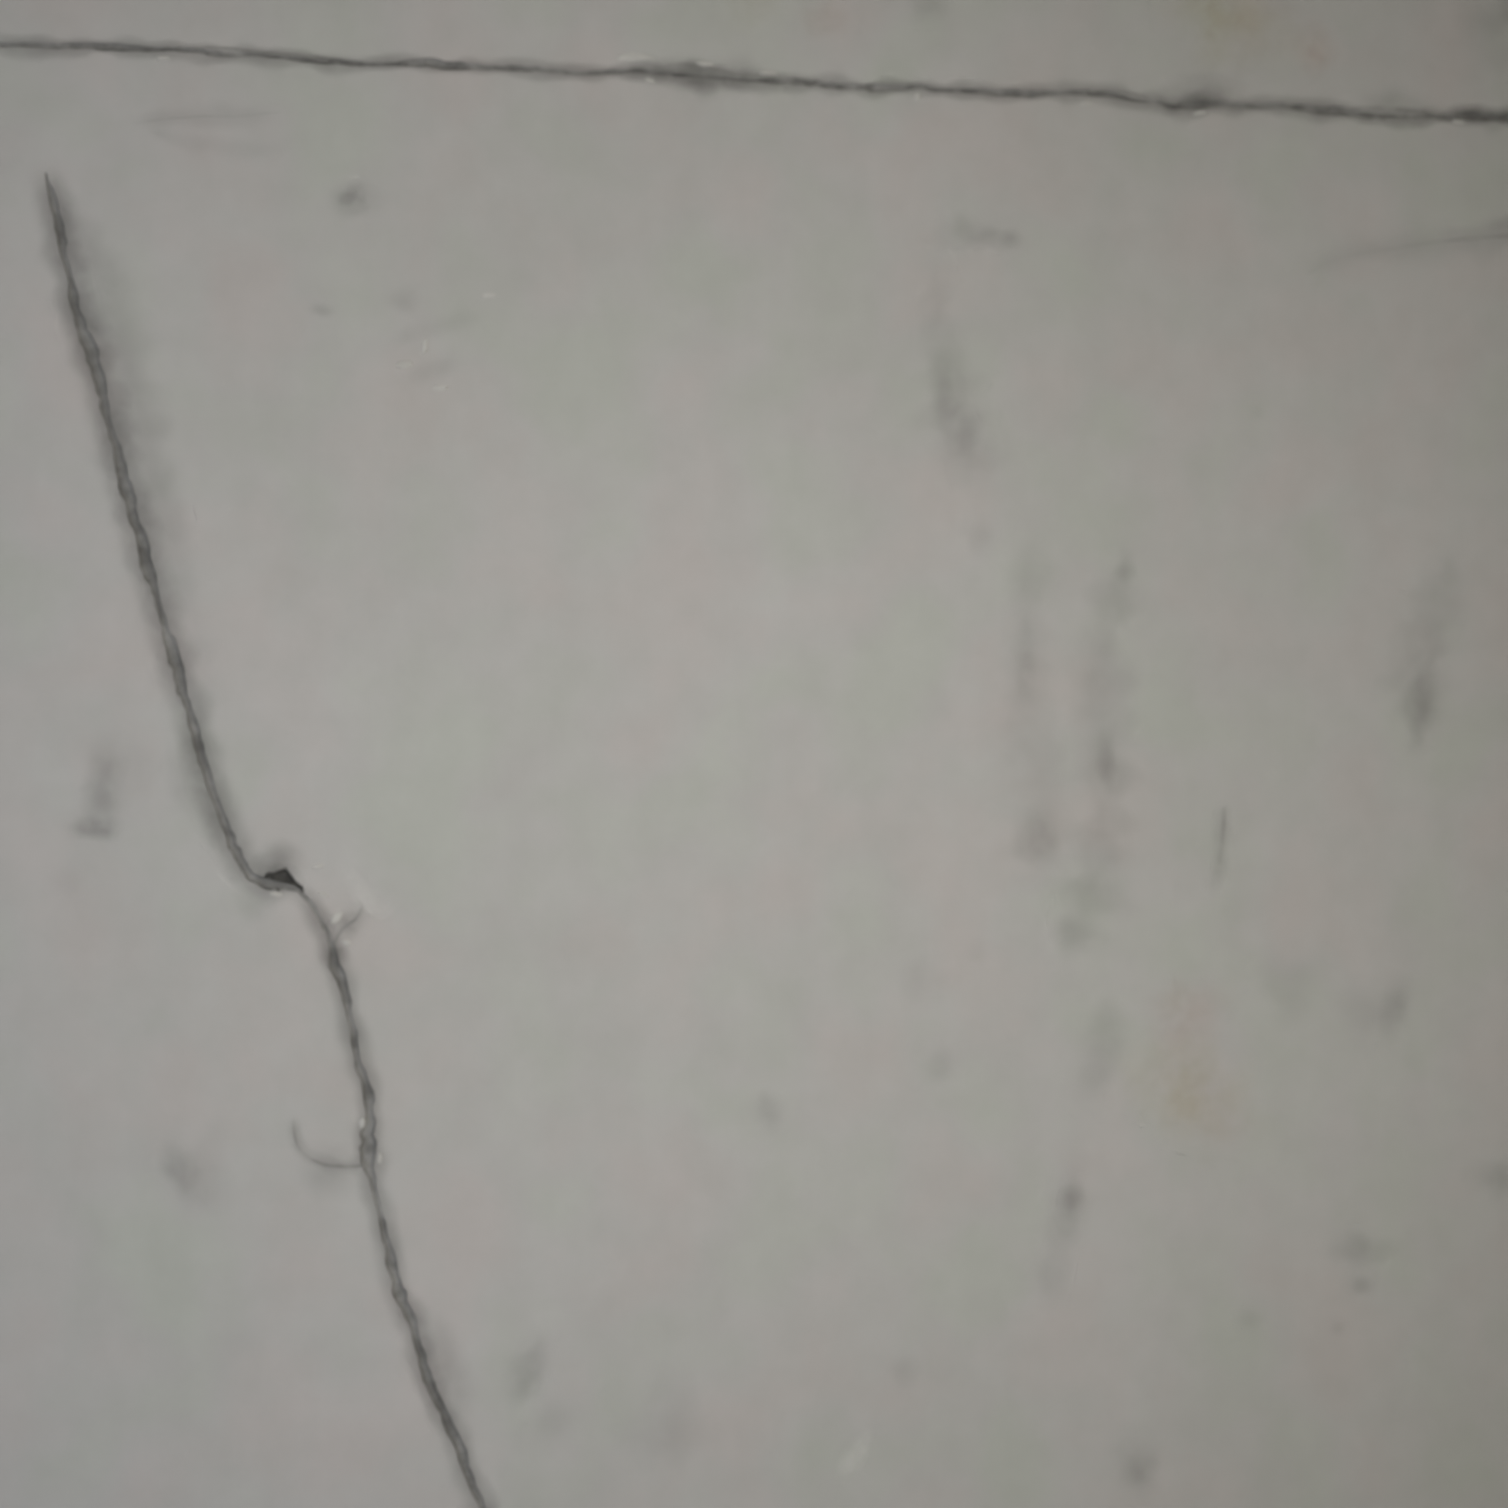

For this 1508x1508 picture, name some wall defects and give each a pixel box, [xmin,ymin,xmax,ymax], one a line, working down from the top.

crack [0,42,1508,124]
crack [45,174,486,1508]